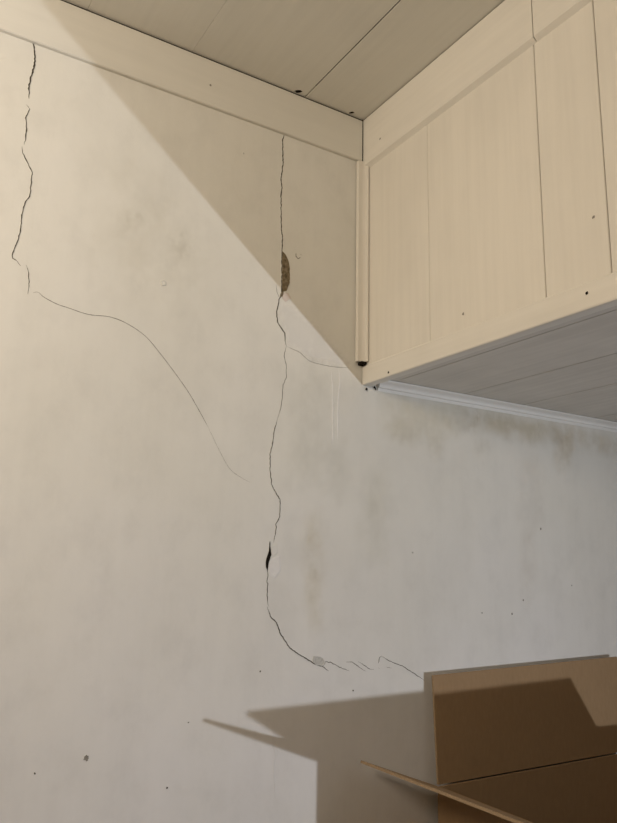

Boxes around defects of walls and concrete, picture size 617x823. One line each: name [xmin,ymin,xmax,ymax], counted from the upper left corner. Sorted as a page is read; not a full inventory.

crack [11,43,250,483]
spalling [280,251,291,302]
crack [269,135,347,539]
spalling [266,543,281,578]
crack [266,571,425,681]